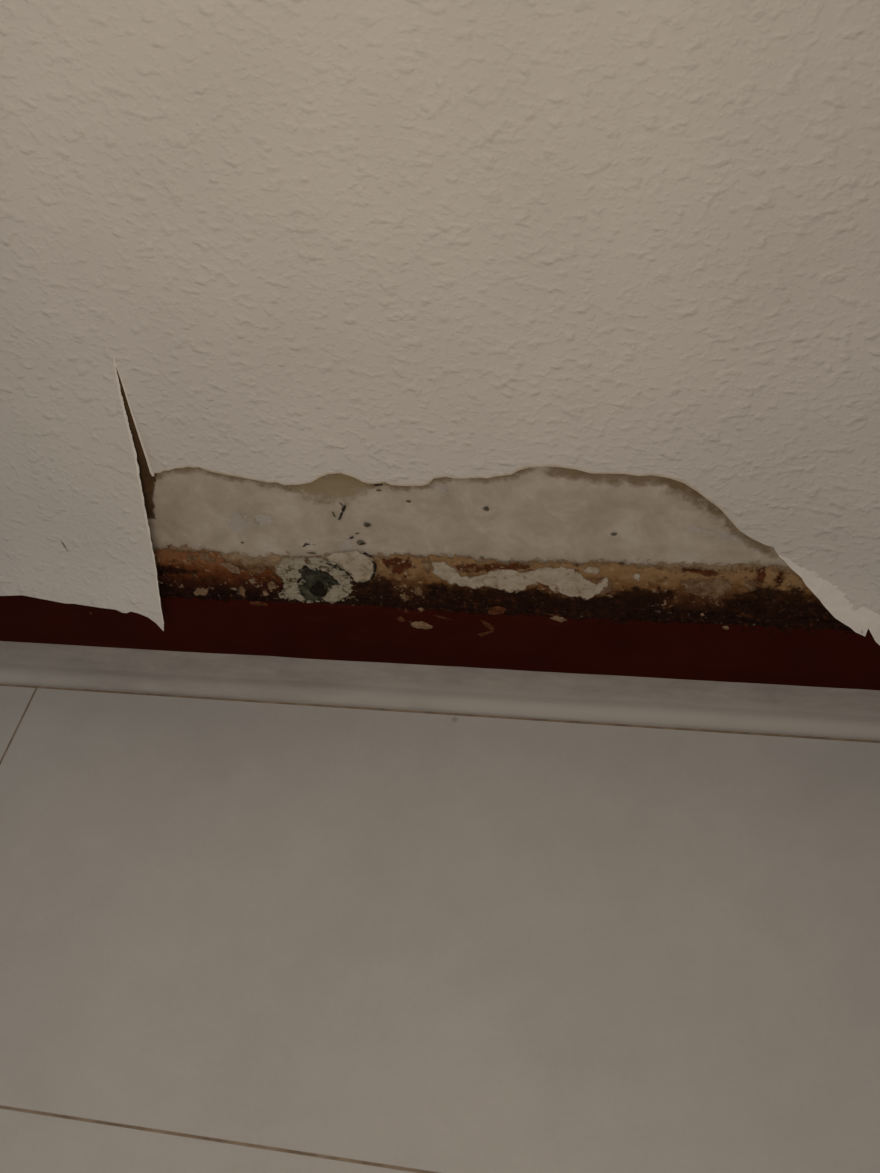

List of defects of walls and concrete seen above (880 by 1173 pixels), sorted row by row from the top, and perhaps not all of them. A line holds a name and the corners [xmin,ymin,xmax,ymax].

damp [156,467,451,520]
peeling [397,585,452,629]
peeling [148,466,801,616]
damp [275,522,855,634]
damp [548,467,771,553]